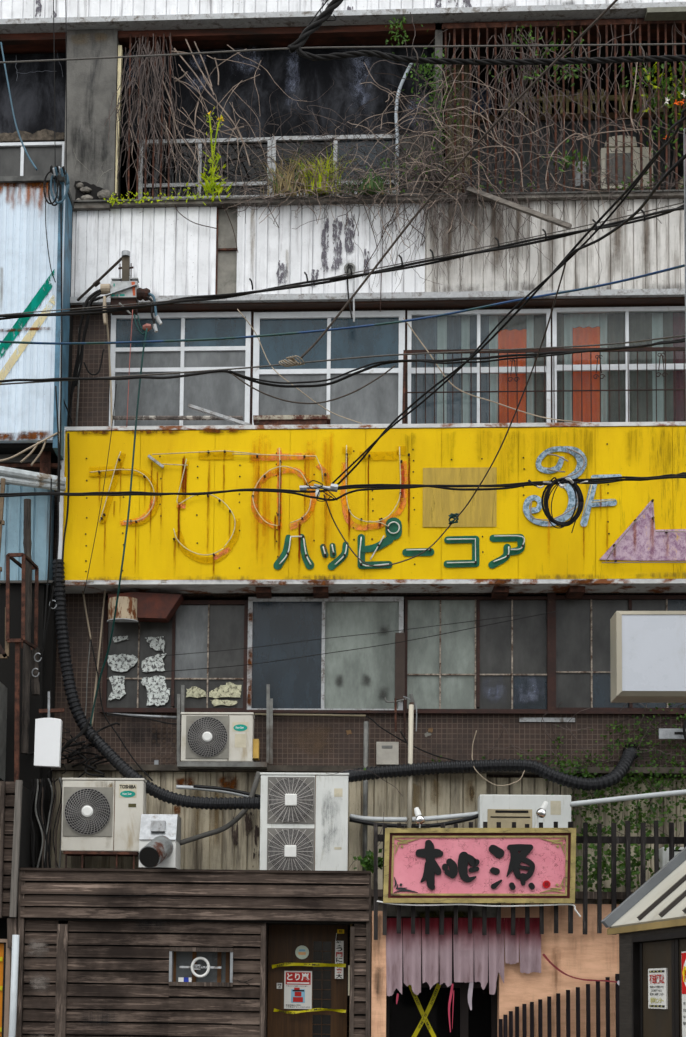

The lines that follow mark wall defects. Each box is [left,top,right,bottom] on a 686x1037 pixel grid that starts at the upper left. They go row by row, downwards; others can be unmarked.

rust [0,182,54,207]
rust [174,456,187,555]
rust [257,465,281,550]